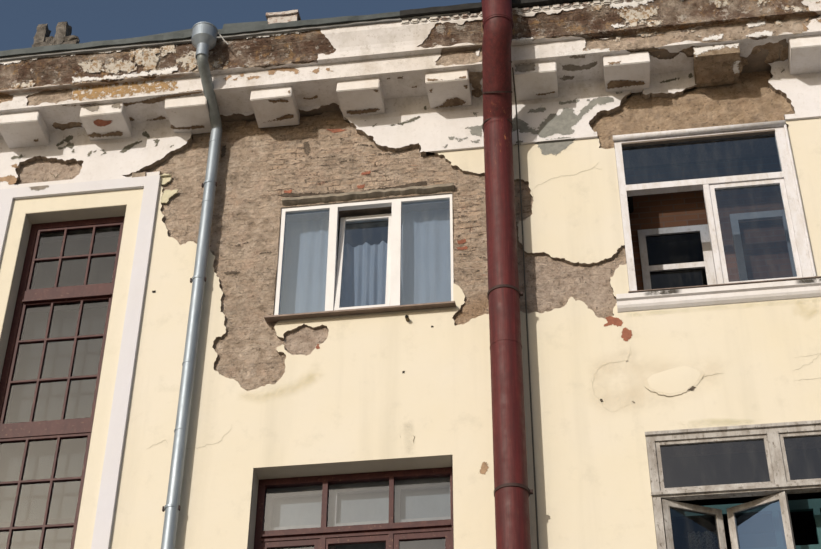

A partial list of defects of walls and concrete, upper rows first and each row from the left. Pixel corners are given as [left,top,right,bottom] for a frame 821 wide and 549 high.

spalling [0,122,82,191]
spalling [0,43,202,138]
peeling [120,131,160,153]
spalling [146,115,211,245]
spalling [208,27,341,81]
spalling [391,97,465,126]
spalling [418,16,483,98]
spalling [512,0,821,155]
spalling [209,108,489,391]
spalling [514,181,632,341]